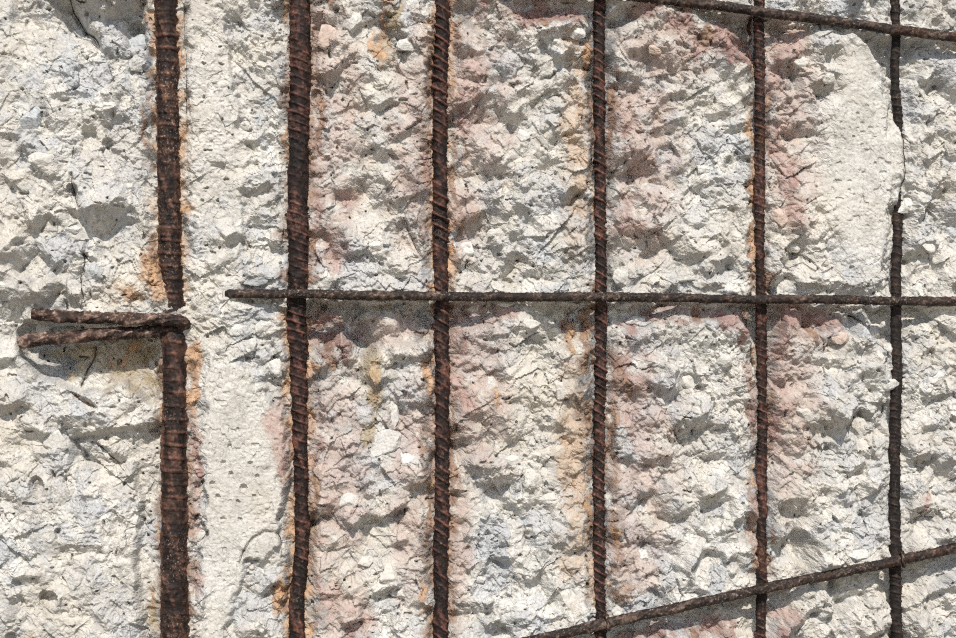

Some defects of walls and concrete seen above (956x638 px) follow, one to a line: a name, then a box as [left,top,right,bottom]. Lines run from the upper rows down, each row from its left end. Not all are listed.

crack [70,0,100,47]
rust [120,234,166,301]
rust [185,342,204,539]
rust [304,396,374,638]
rust [446,0,487,288]
spalling [183,0,956,297]
spalling [183,293,956,638]
rust [511,0,634,222]
rust [556,321,651,614]
rust [628,2,753,74]
rust [640,304,842,449]
crack [899,132,910,195]